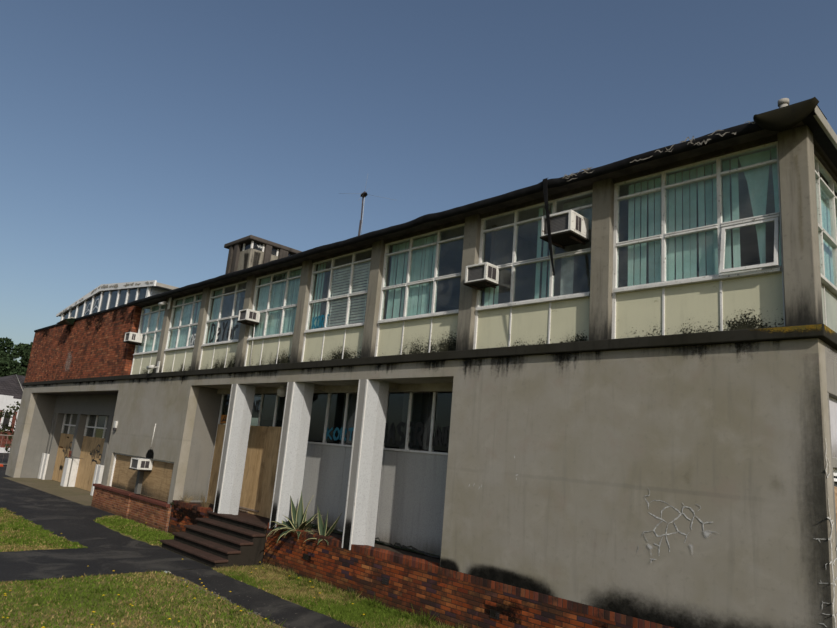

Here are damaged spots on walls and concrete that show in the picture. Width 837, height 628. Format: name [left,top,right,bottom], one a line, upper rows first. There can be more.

crack [637,488,720,560]
water stain [440,559,553,596]
water stain [593,594,747,628]
crack [813,499,837,628]